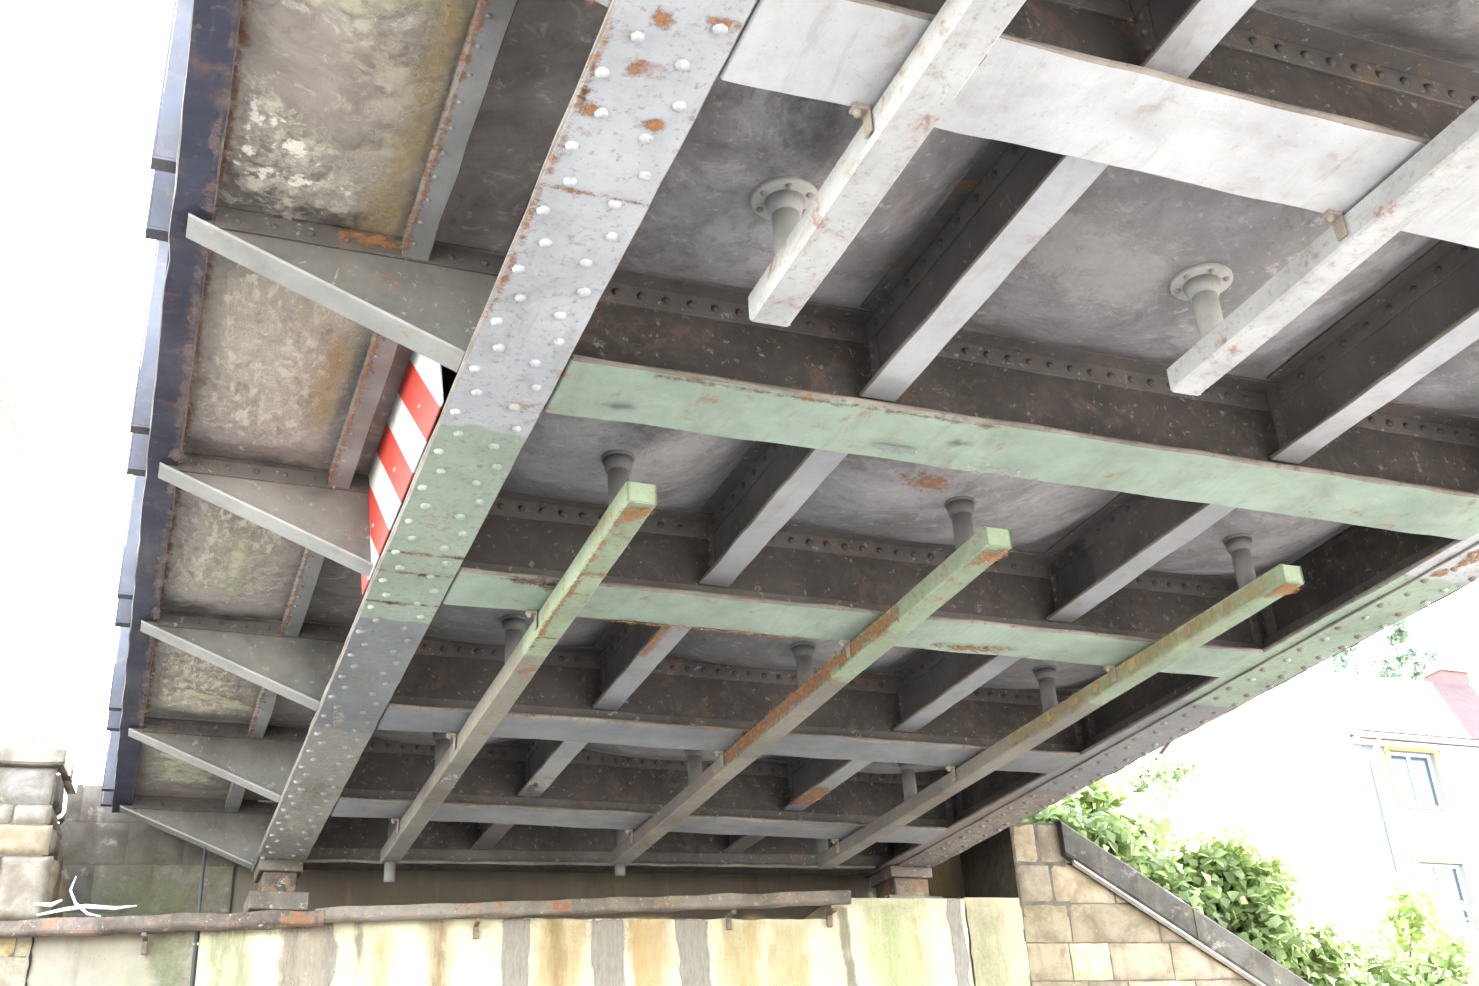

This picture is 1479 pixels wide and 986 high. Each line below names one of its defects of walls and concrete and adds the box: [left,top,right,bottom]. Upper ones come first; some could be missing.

corrosion [653,8,675,29]
corrosion [574,28,612,116]
leakage [224,0,478,224]
corrosion [643,120,665,131]
corrosion [485,136,593,318]
corrosion [505,507,653,648]
corrosion [1431,551,1479,577]
leakage [263,922,363,986]
leakage [496,919,535,986]
leakage [587,919,631,986]
leakage [675,919,715,986]
leakage [837,908,858,986]